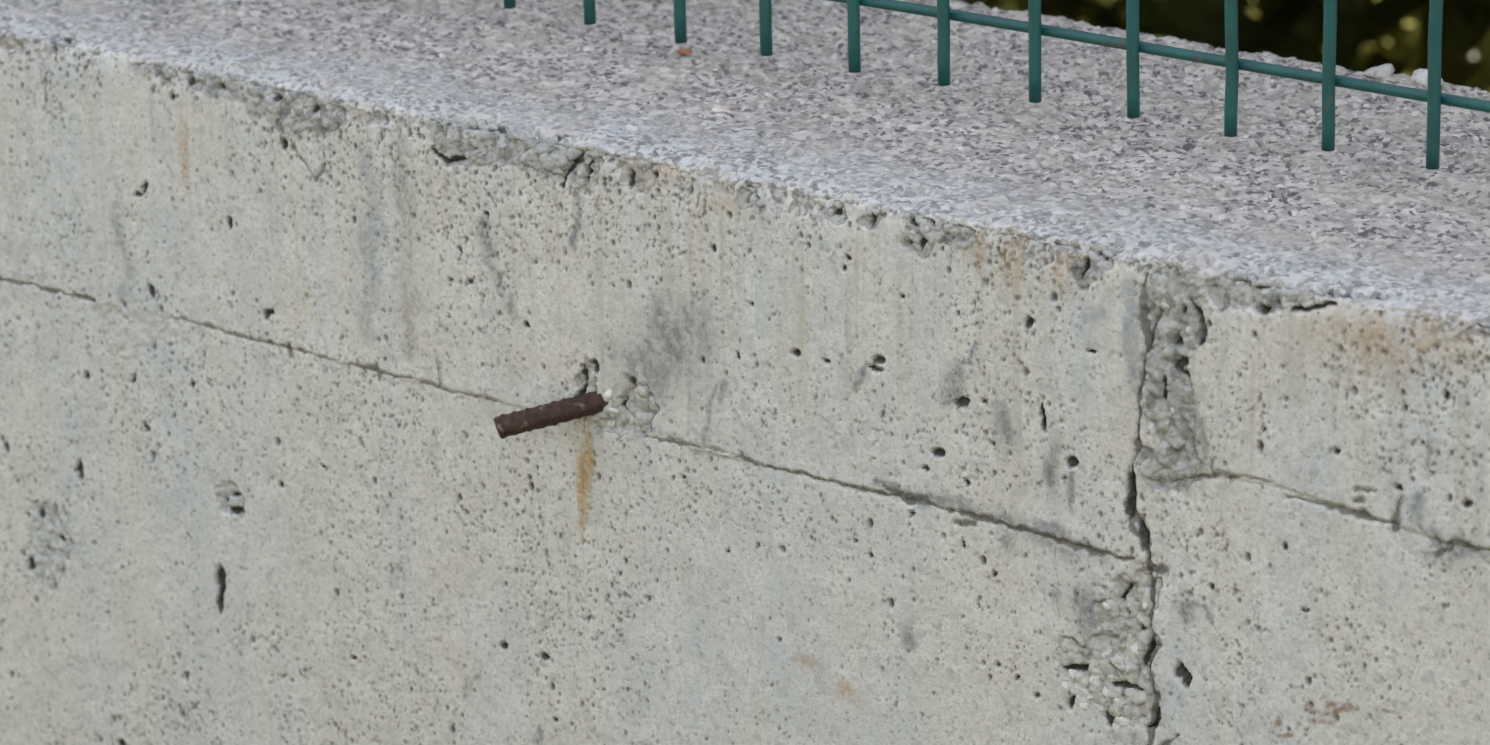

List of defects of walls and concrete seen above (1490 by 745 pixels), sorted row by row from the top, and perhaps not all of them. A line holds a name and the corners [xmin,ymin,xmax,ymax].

crack [0,278,96,301]
crack [181,318,498,402]
spalling [494,358,660,440]
spalling [1135,264,1380,491]
crack [644,275,1207,745]
crack [1175,459,1402,533]
crack [1434,540,1490,558]
spalling [1053,567,1163,727]